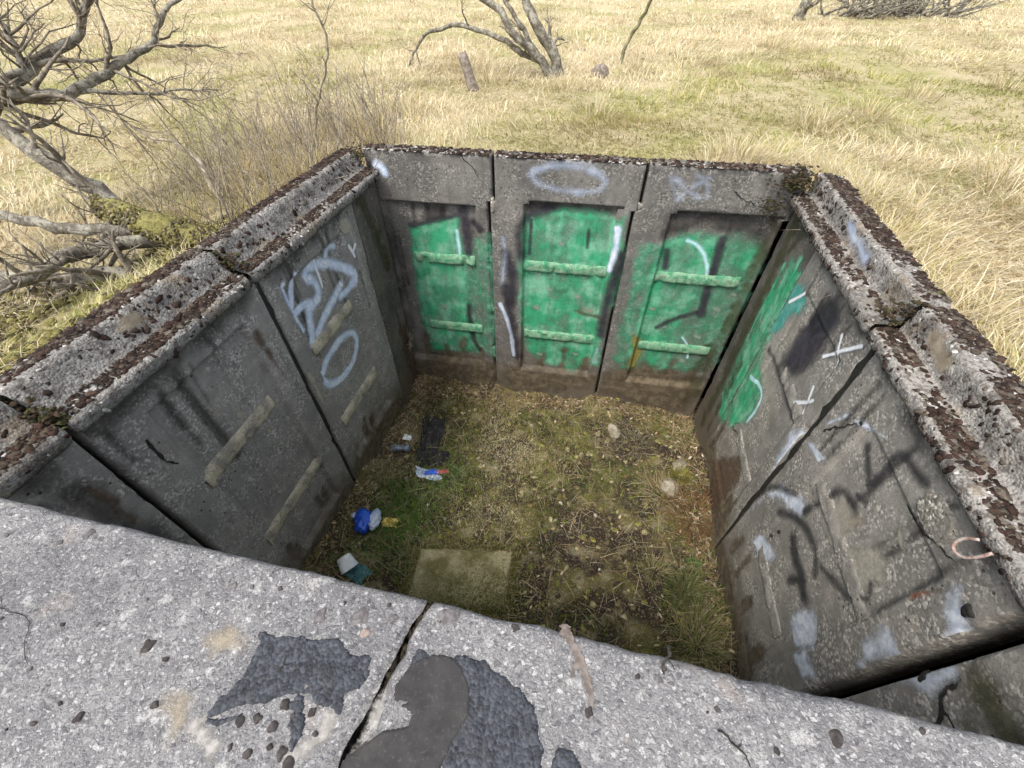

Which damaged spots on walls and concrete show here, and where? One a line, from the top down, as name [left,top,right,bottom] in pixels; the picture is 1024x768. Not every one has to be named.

crack [823,423,858,438]
peeling [205,713,243,727]
peeling [287,693,306,752]